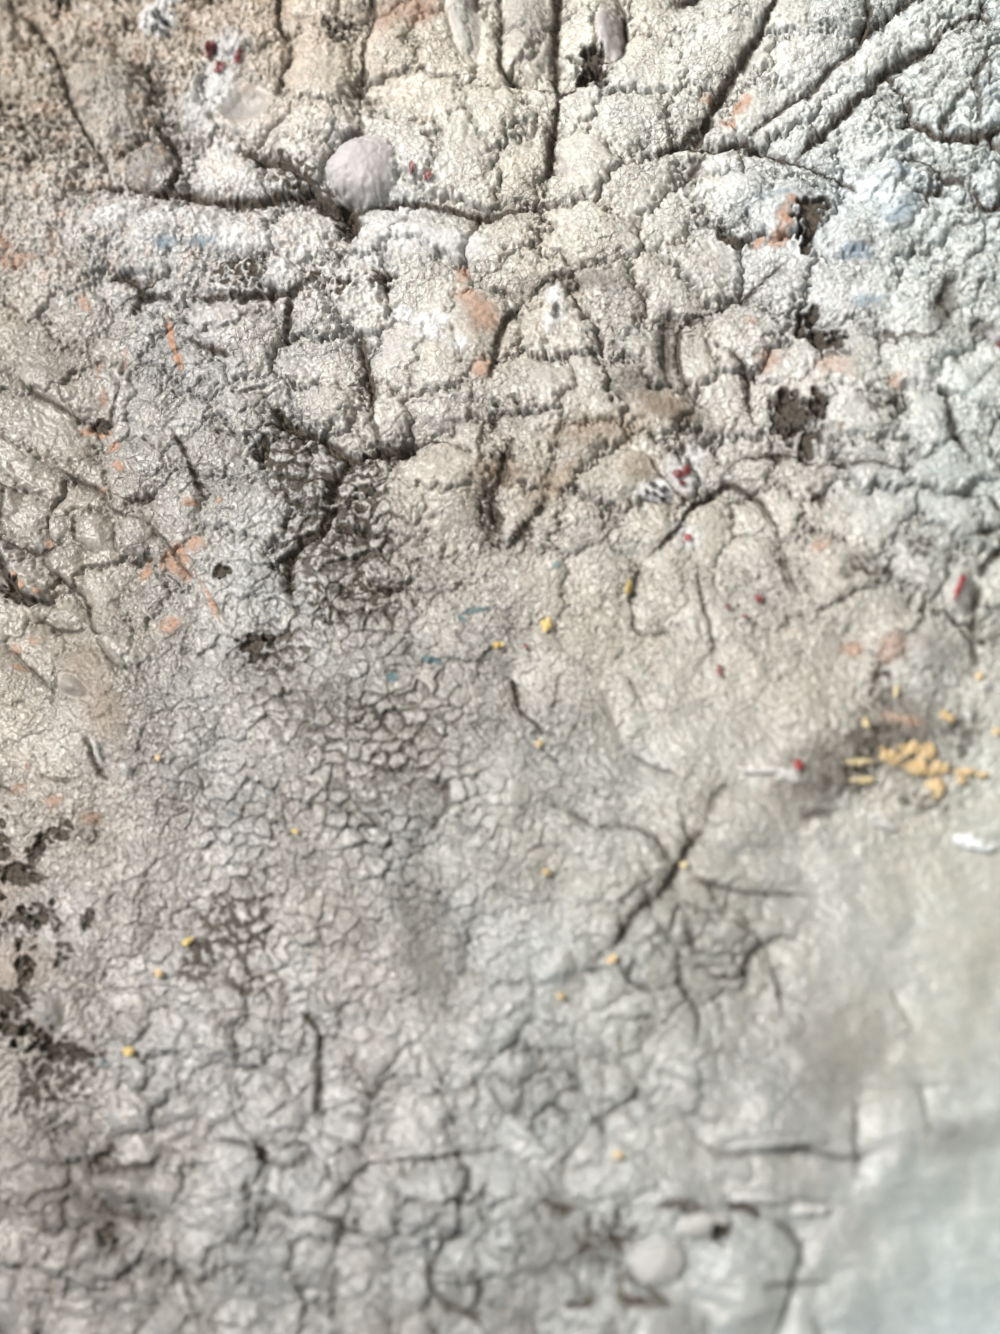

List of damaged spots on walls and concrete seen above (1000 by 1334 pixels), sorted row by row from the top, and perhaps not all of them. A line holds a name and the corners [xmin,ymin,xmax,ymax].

crack [9,0,629,242]
crack [649,0,1000,213]
crack [0,468,189,670]
crack [109,271,321,346]
crack [257,337,471,614]
crack [486,310,520,384]
crack [676,255,796,417]
crack [629,441,919,634]
spalling [771,385,829,463]
spalling [793,304,848,353]
spalling [0,805,95,1062]
crack [302,1014,323,1112]